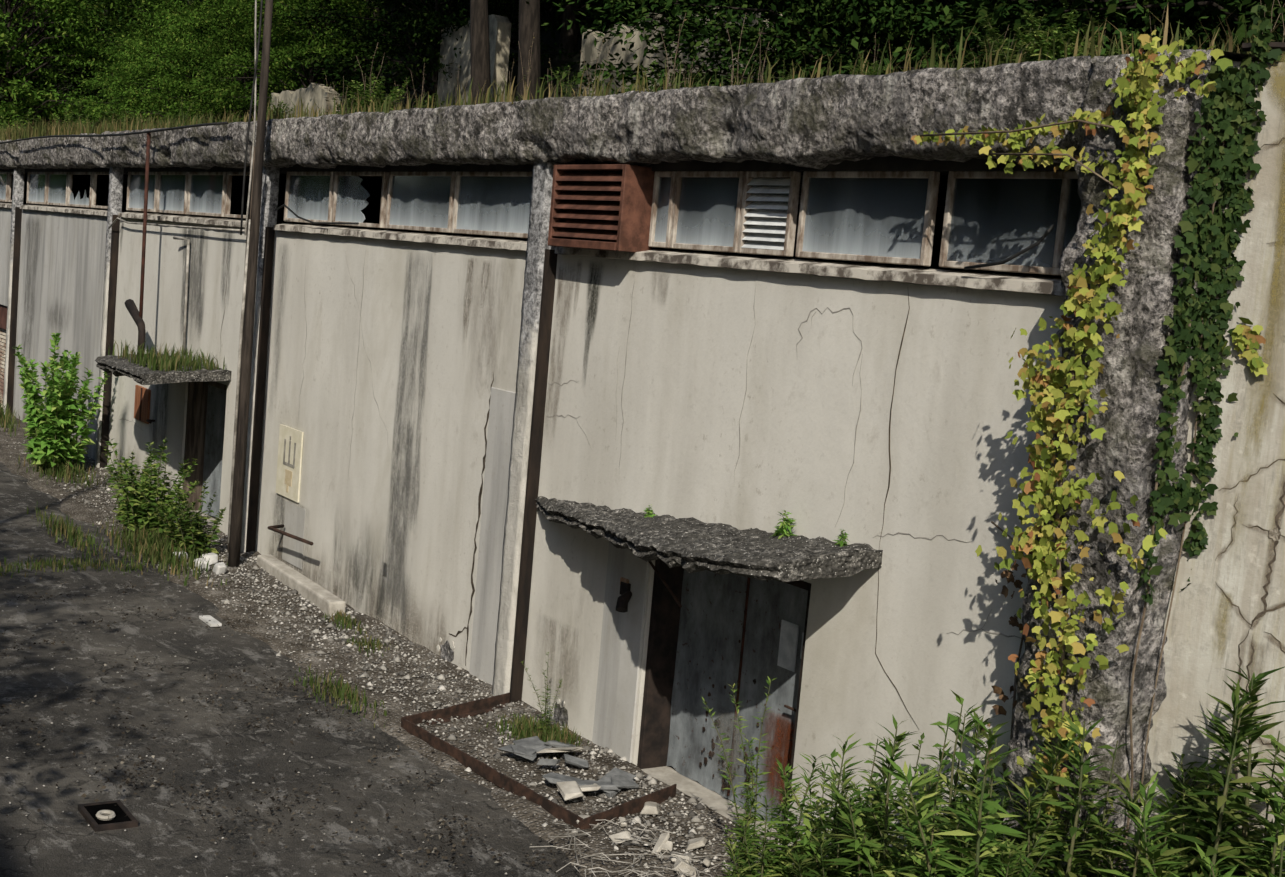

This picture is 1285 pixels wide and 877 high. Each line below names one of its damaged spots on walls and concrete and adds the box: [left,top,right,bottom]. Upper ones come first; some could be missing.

water stain [377,279,431,642]
crack [449,375,494,666]
crack [734,280,757,478]
corrosion [766,715,795,802]
crack [796,294,972,729]
crack [1215,459,1285,790]